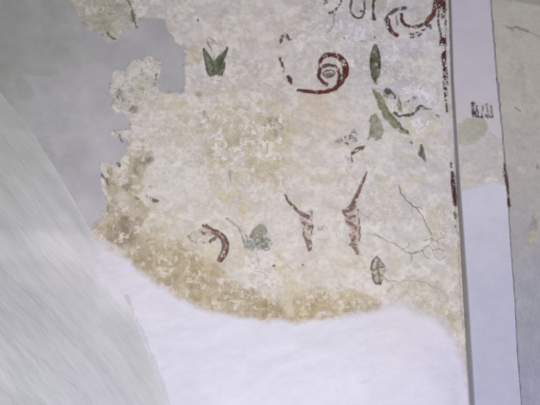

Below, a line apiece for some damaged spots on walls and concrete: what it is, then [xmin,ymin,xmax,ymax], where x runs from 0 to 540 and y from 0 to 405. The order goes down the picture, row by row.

spalling [0,0,188,229]
leakage [94,146,283,318]
leakage [291,288,362,320]